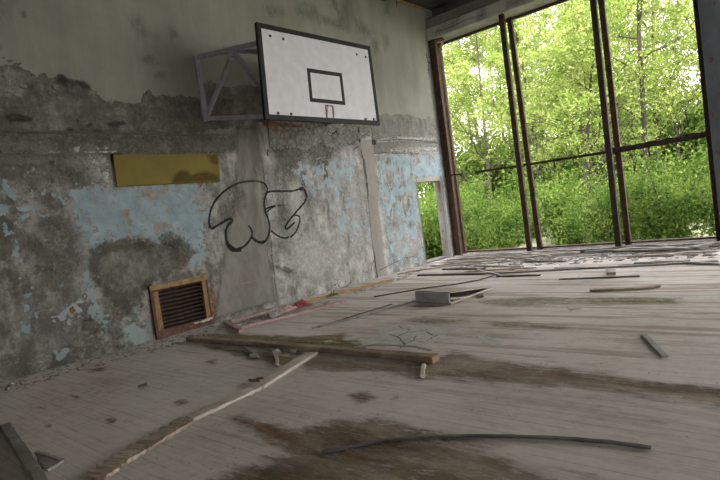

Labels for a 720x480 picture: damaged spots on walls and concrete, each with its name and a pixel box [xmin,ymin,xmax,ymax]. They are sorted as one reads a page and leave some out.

flaking render [0,57,267,137]
peeling [0,179,214,268]
peeling [291,152,369,245]
peeling [371,113,454,269]
peeling [15,277,40,338]
peeling [53,348,69,361]
peeling [47,261,155,348]
damp [57,231,195,367]
crack [389,326,448,349]
damp [586,377,720,396]